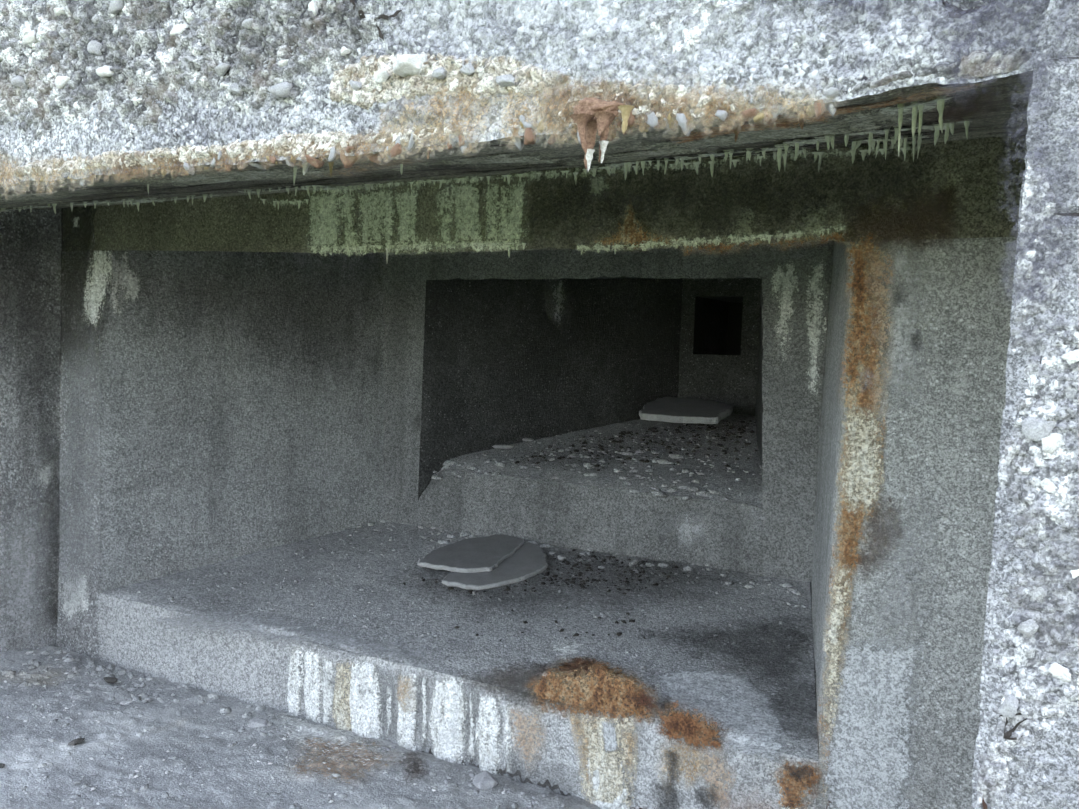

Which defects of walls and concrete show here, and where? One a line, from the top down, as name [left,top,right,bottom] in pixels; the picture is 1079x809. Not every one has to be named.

leakage [0,0,1048,367]
leakage [1022,59,1069,299]
crack [1054,210,1079,218]
rust [594,200,893,809]
leakage [278,645,513,783]
leakage [549,641,590,659]
leakage [570,716,638,809]
rust [477,657,734,801]
leakage [656,753,678,809]
leakage [695,788,715,807]
leakage [639,619,818,738]